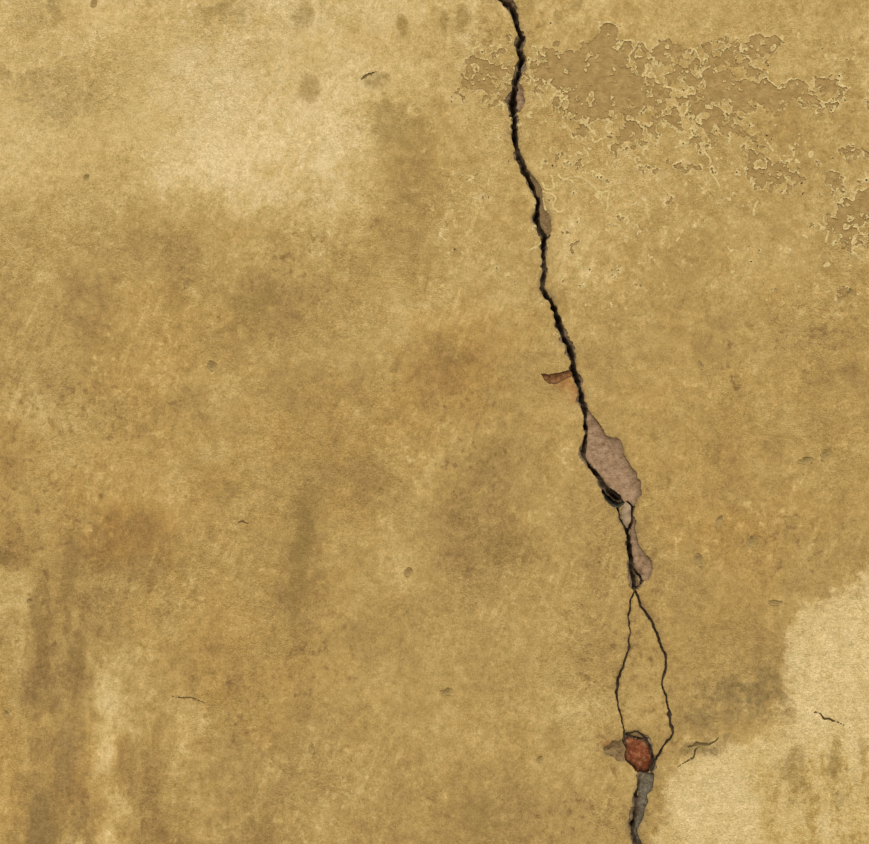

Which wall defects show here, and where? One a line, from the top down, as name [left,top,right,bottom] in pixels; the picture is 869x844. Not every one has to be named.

peeling [452,21,869,271]
leakage [278,452,330,645]
crack [477,0,719,844]
spalling [585,410,653,581]
leakage [17,521,95,844]